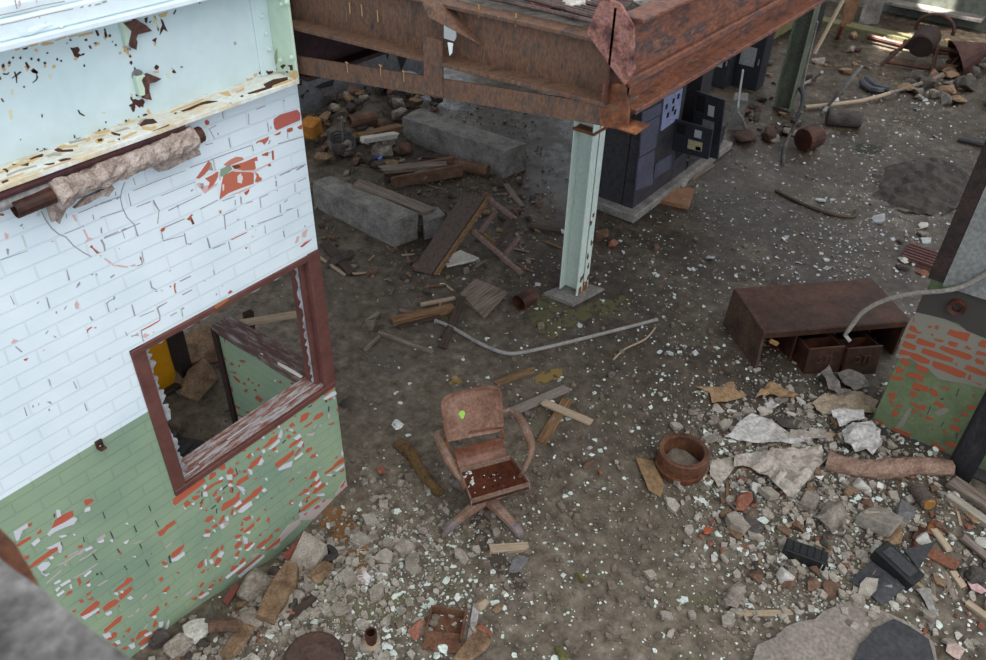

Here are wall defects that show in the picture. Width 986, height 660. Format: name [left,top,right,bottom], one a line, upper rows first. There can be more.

corrosion [0,64,298,183]
flaking render [256,110,313,145]
spalling [196,157,262,214]
flaking render [873,315,986,455]
peeling [17,511,74,569]
flaking render [173,381,345,600]
peeling [65,544,184,650]